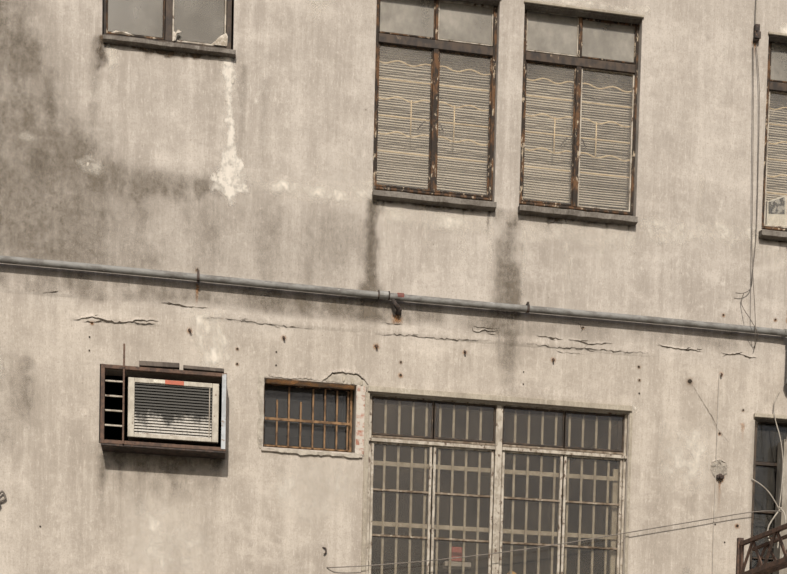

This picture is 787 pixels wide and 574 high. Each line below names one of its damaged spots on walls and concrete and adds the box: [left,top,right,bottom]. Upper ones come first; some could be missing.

water stain [0,18,41,81]
water stain [97,35,220,67]
peeling [210,57,248,205]
water stain [0,95,183,260]
water stain [272,180,407,221]
water stain [415,204,474,229]
water stain [322,222,393,319]
crack [74,302,312,329]
crack [385,322,498,341]
water stain [491,260,520,354]
crack [536,322,757,358]
flaking render [257,368,369,458]